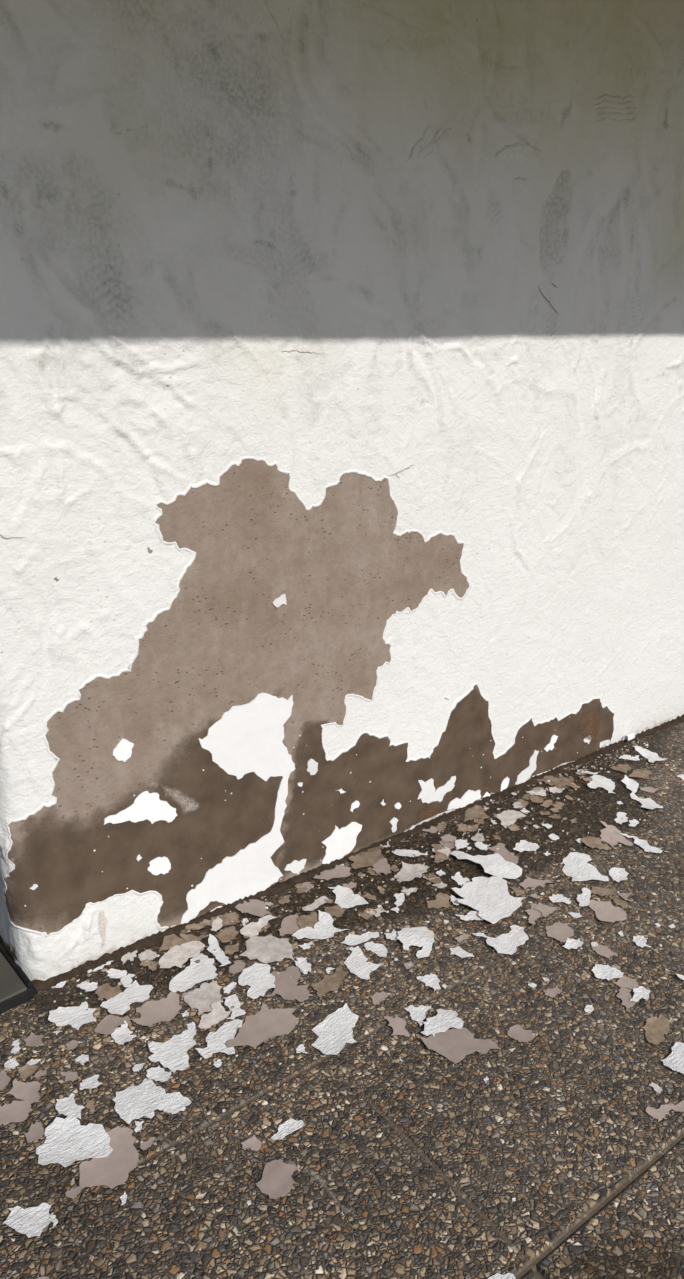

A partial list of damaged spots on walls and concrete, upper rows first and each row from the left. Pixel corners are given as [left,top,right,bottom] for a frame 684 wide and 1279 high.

peeling [2,456,666,958]